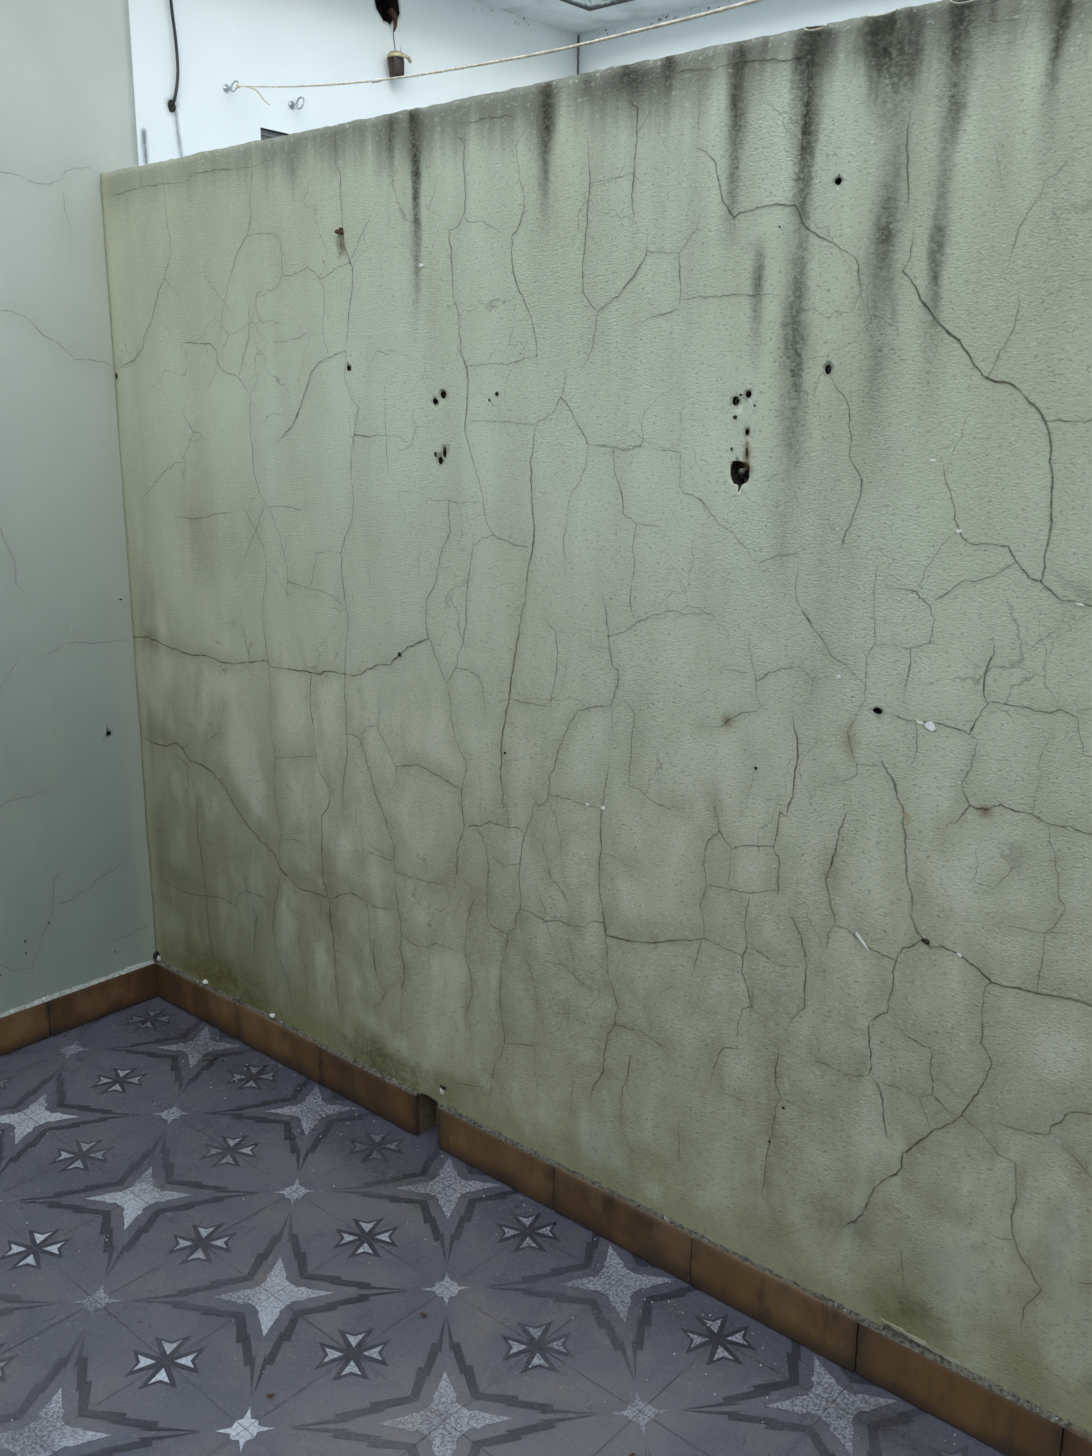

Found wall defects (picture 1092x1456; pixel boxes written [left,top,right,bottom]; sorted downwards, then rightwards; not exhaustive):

damp [541,81,552,166]
crack [574,35,582,75]
damp [621,64,637,84]
damp [731,42,745,131]
damp [796,26,830,210]
damp [863,7,918,76]
damp [949,0,975,118]
damp [1053,0,1072,61]
damp [409,109,420,229]
crack [54,117,1092,1321]